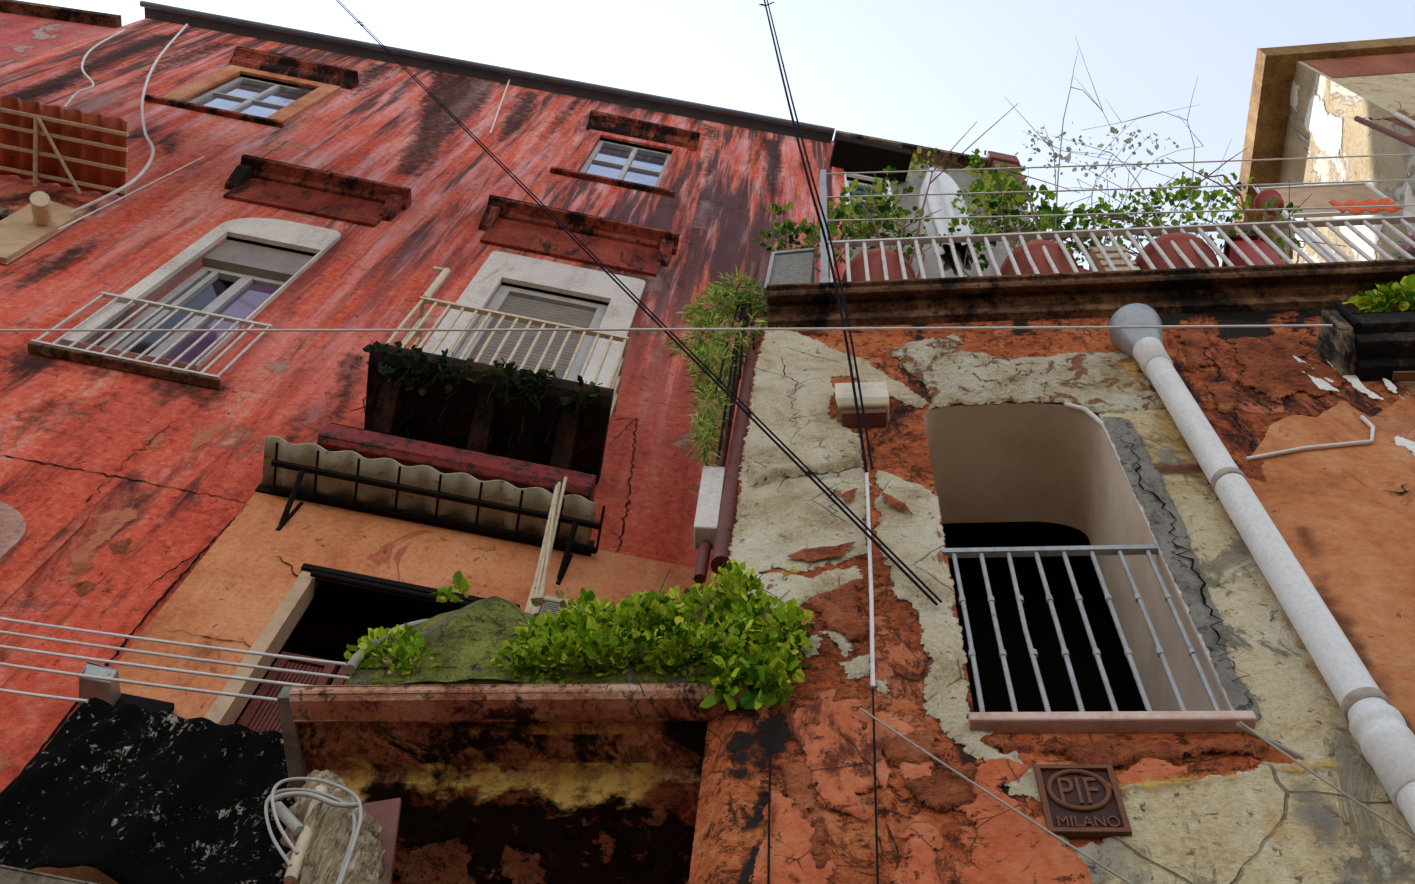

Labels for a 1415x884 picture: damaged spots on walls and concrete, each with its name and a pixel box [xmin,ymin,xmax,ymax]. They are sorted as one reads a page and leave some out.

water stain [6,34,232,101]
water stain [354,64,392,95]
water stain [397,72,493,175]
water stain [500,91,536,141]
water stain [0,189,97,211]
water stain [17,240,97,288]
crack [609,417,638,553]
crack [0,421,285,667]
crack [277,556,318,589]
flaking render [728,326,1415,884]
crack [20,702,79,774]
water stain [364,781,695,884]